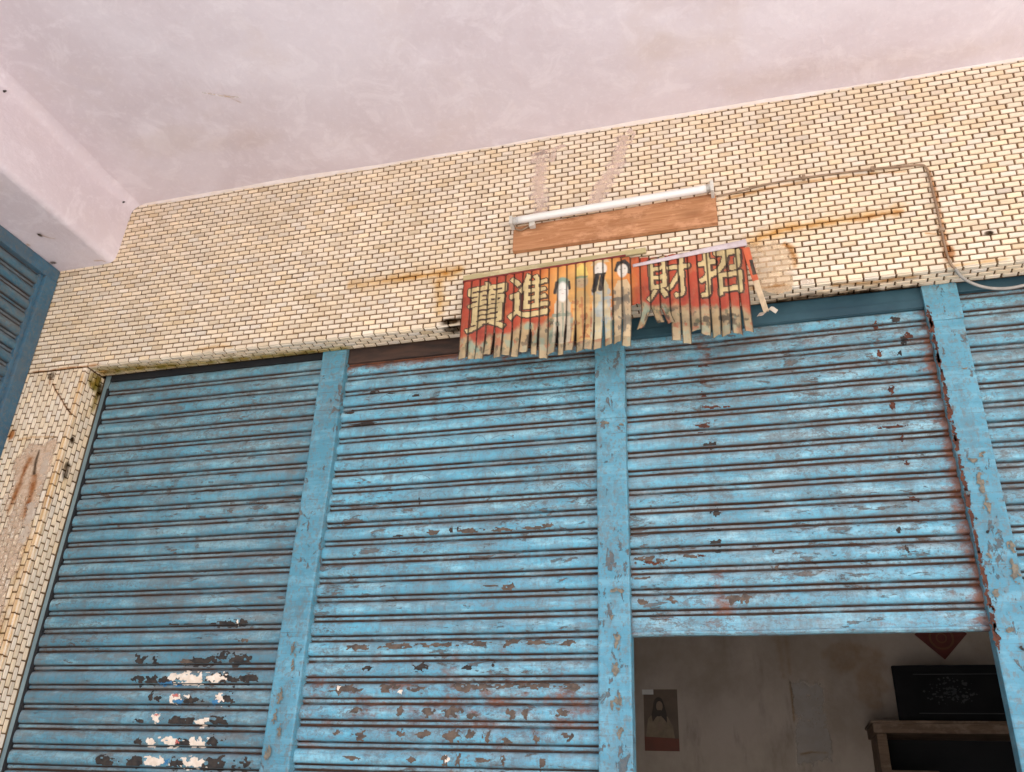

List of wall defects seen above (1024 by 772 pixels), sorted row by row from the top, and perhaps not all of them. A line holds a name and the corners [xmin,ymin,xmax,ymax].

corrosion [890,316,913,356]
corrosion [695,381,731,450]
corrosion [926,305,1001,653]
peeling [968,452,992,520]
corrosion [704,505,729,553]
peeling [1006,540,1022,584]
peeling [95,618,258,772]